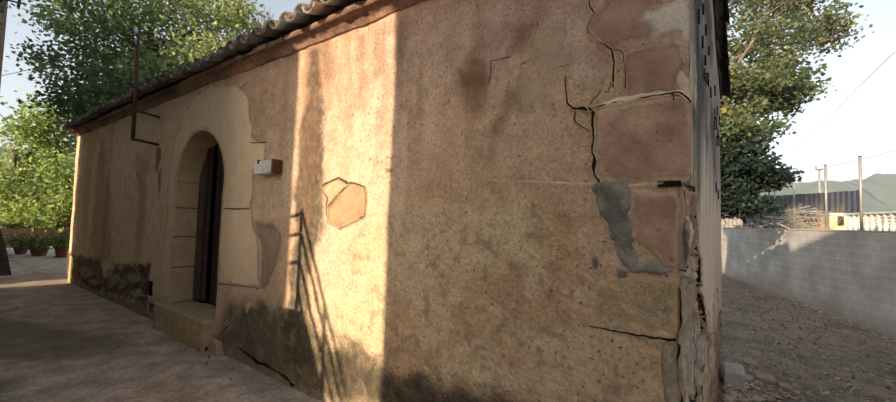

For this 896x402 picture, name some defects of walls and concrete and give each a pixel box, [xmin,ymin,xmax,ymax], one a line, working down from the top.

spalling [66,253,154,310]
spalling [321,176,367,230]
leakage [220,49,513,402]
crack [547,0,720,402]
spalling [676,181,723,402]